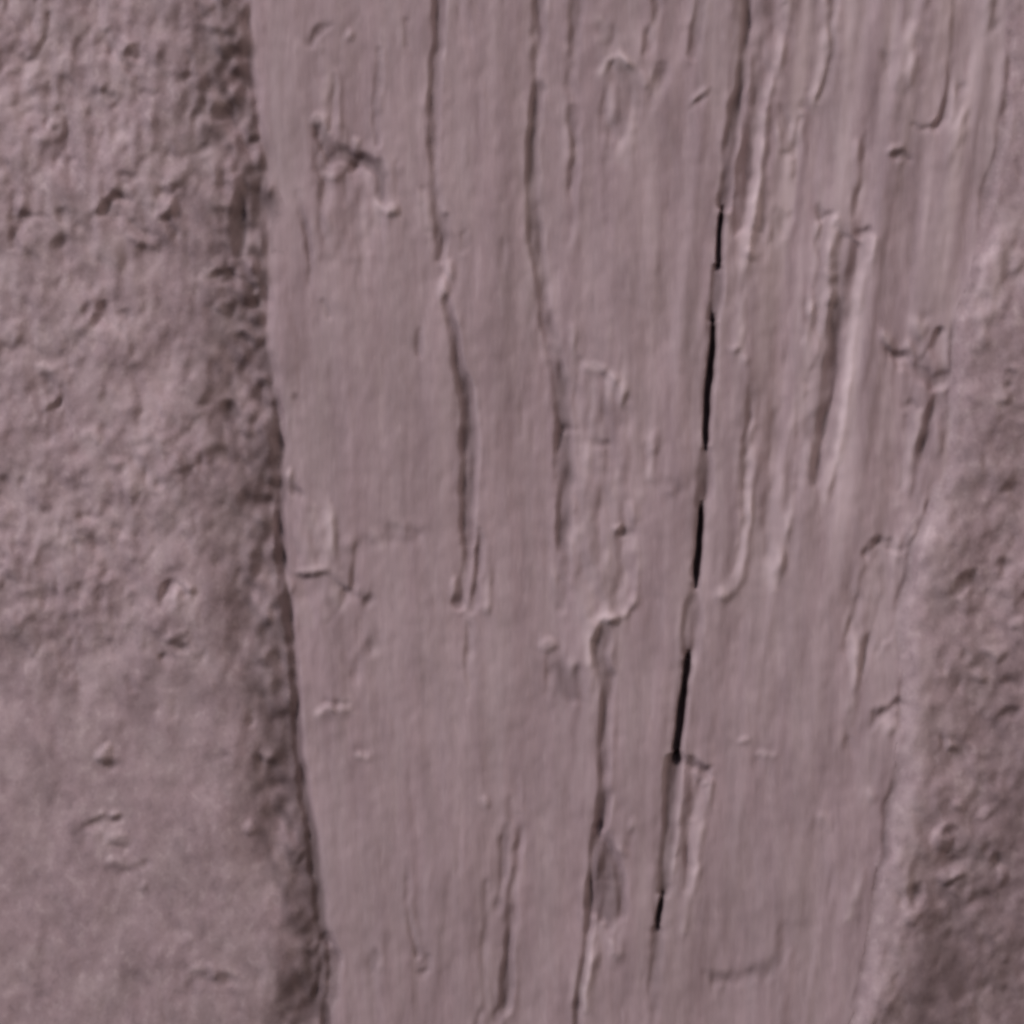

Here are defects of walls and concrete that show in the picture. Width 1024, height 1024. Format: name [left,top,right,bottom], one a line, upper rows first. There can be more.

crack [641,0,751,1024]